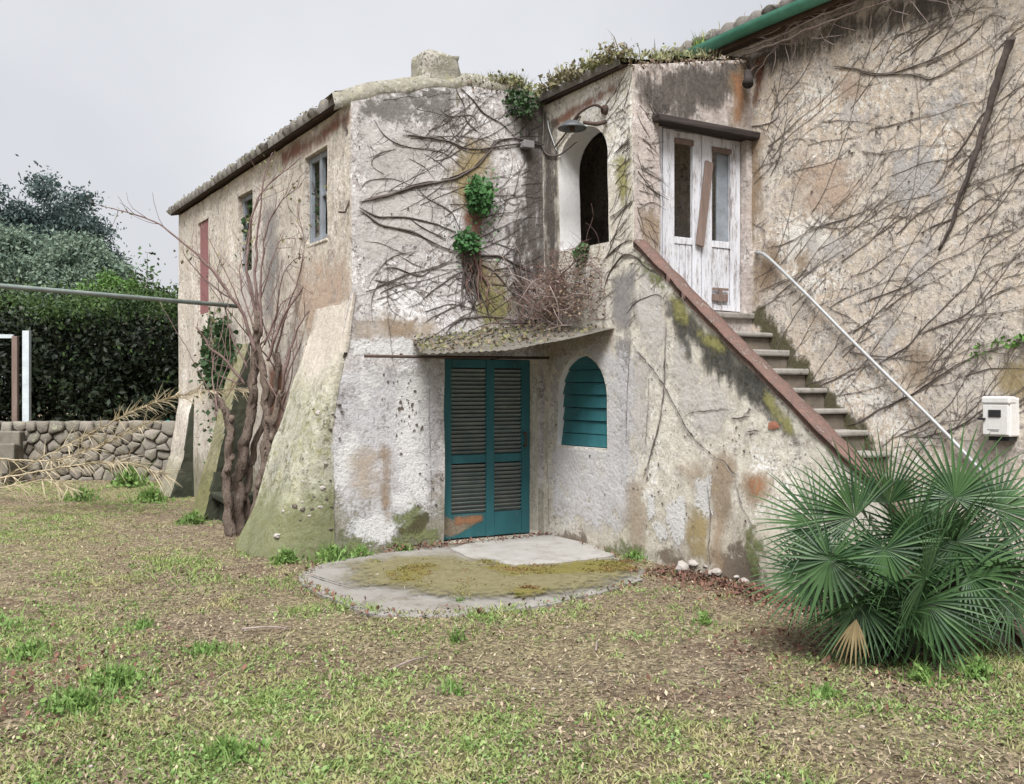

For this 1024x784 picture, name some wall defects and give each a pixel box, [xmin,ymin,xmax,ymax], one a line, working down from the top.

water stain [636,0,951,118]
water stain [343,393,390,508]
peeling [547,268,780,549]
crack [625,308,763,527]
crack [705,489,713,561]
water stain [665,300,800,444]
corrosion [744,474,768,502]